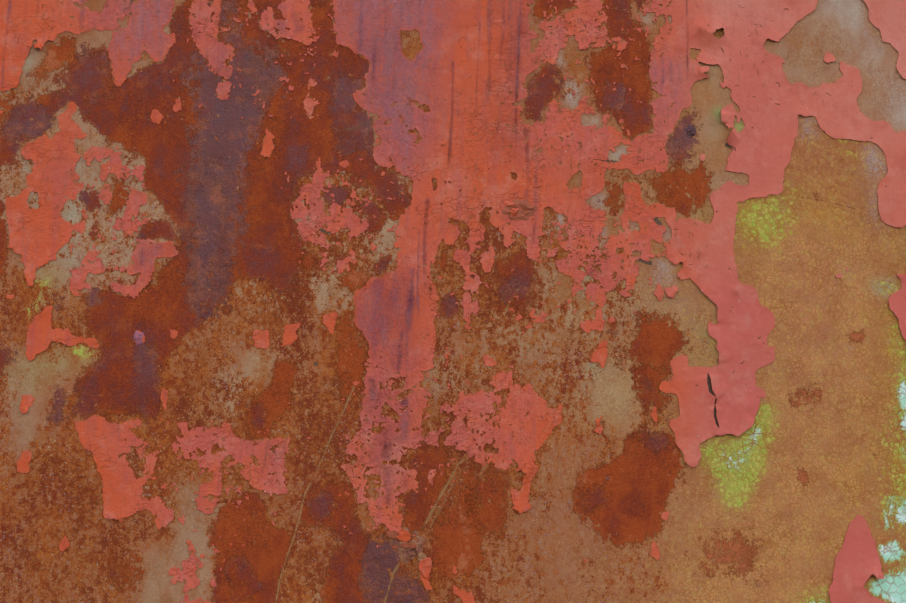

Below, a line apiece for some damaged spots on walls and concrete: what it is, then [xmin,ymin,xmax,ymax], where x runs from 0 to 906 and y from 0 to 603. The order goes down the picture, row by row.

rust [0,0,412,440]
rust [520,64,567,121]
rust [532,0,576,23]
rust [584,0,653,140]
rust [598,107,723,218]
peeling [0,0,413,603]
peeling [378,0,906,603]
rust [568,310,695,550]
rust [207,491,295,603]
rust [299,444,519,603]